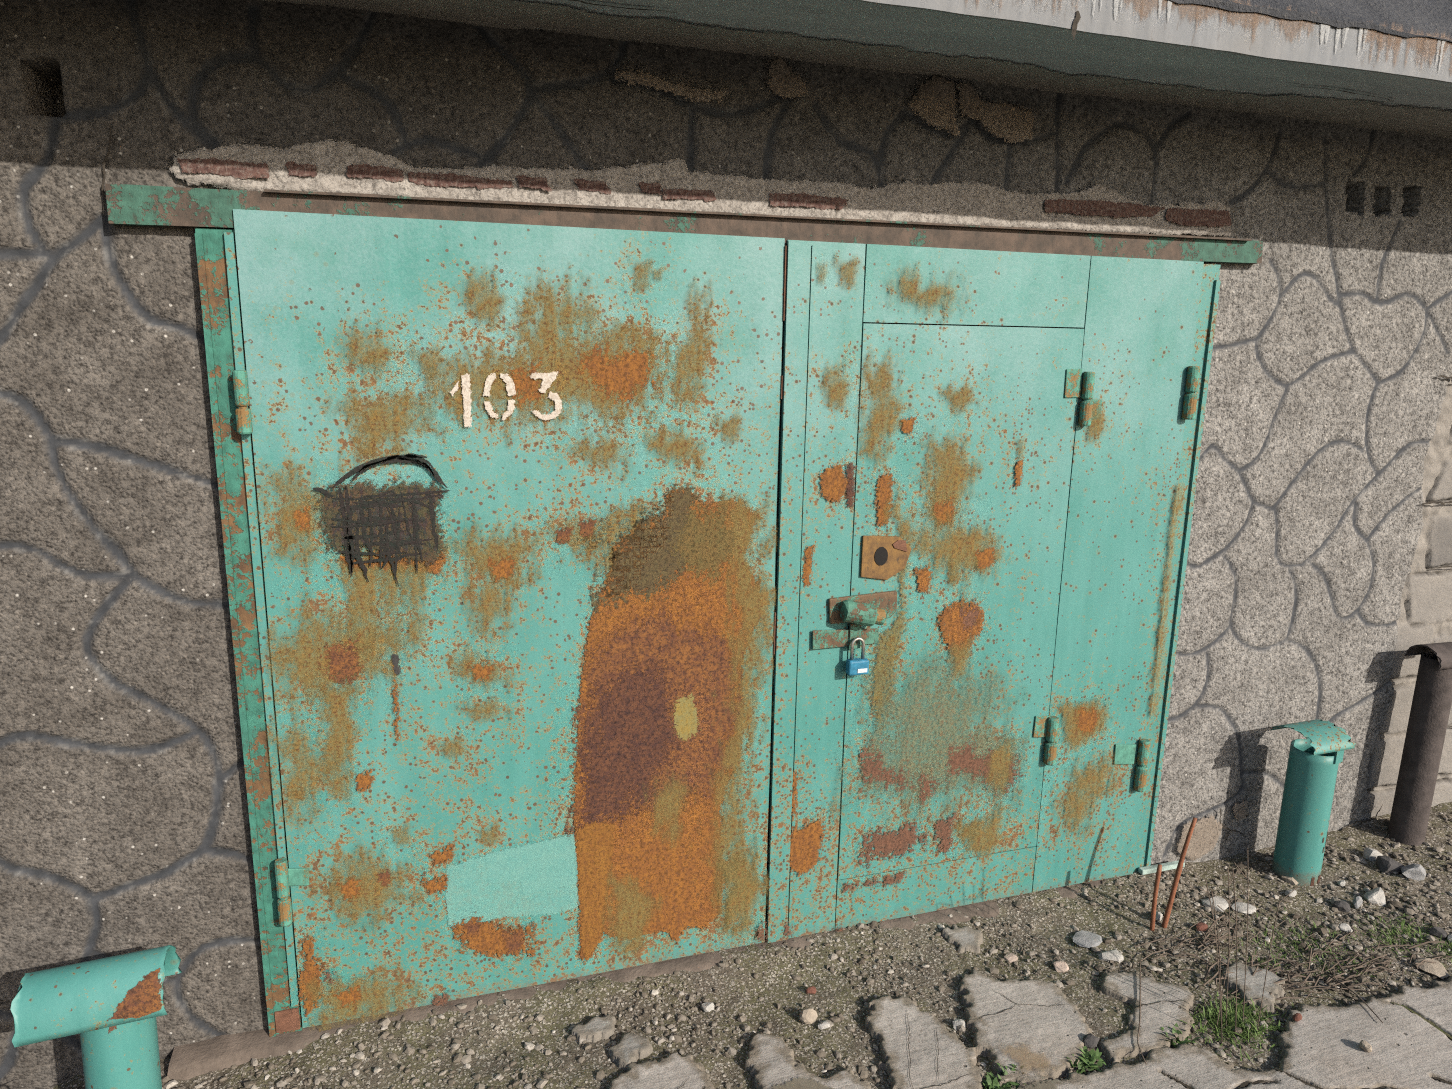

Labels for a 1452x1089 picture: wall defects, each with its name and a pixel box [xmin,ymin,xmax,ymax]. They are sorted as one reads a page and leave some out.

spalling [908,76,1035,143]
spalling [169,138,1232,237]
corrosion [259,265,777,965]
corrosion [790,349,1043,878]
corrosion [1149,485,1185,718]
corrosion [1054,696,1126,838]
corrosion [107,968,163,1021]
crack [907,1015,972,1089]
crack [977,991,1071,1020]
crack [1161,1072,1193,1089]
crack [1237,1068,1397,1089]
crack [1391,1002,1452,1039]